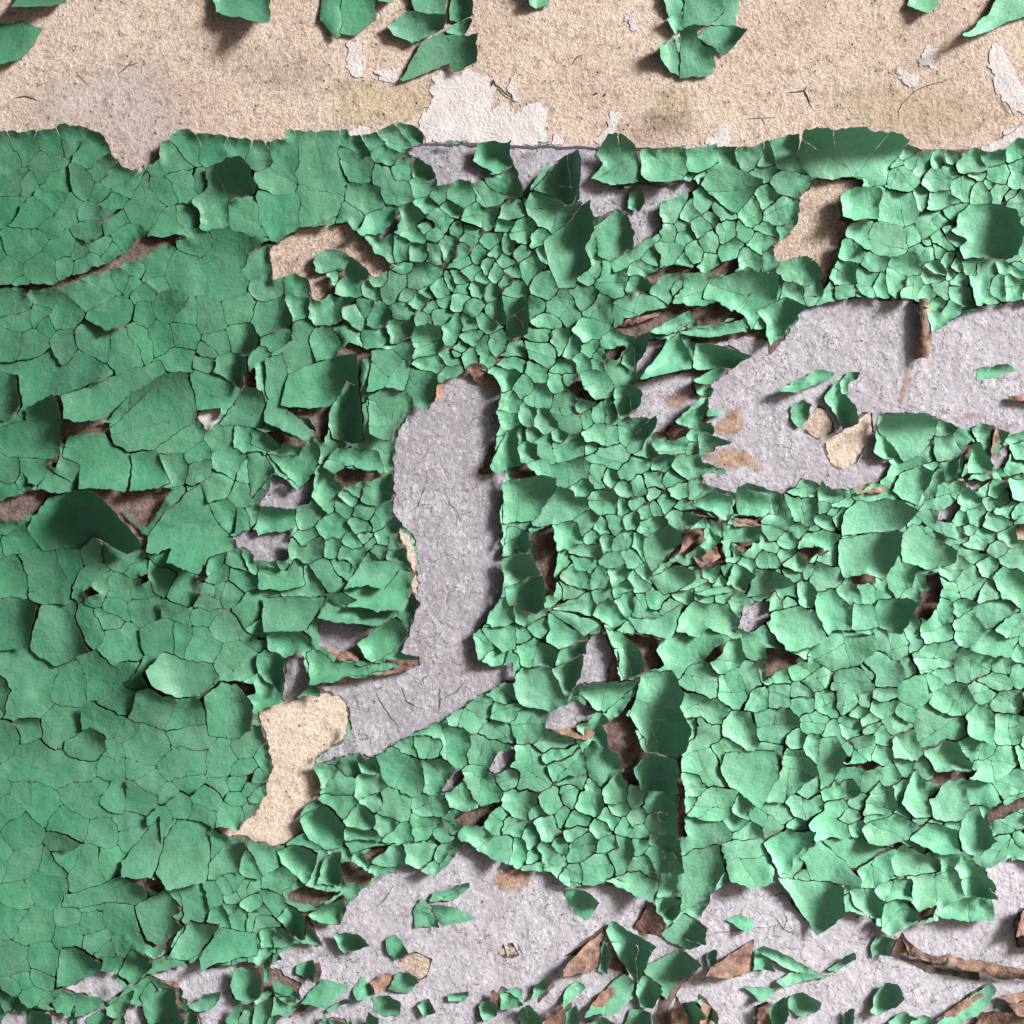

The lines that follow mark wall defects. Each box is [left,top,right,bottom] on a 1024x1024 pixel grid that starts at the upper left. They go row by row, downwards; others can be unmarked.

peeling [0,20,42,64]
peeling [213,0,271,23]
peeling [320,0,478,81]
peeling [529,0,550,9]
peeling [660,0,748,78]
peeling [907,0,939,14]
peeling [963,0,1024,37]
flaking render [0,122,1024,847]
crack [376,685,462,726]
crack [711,893,798,937]